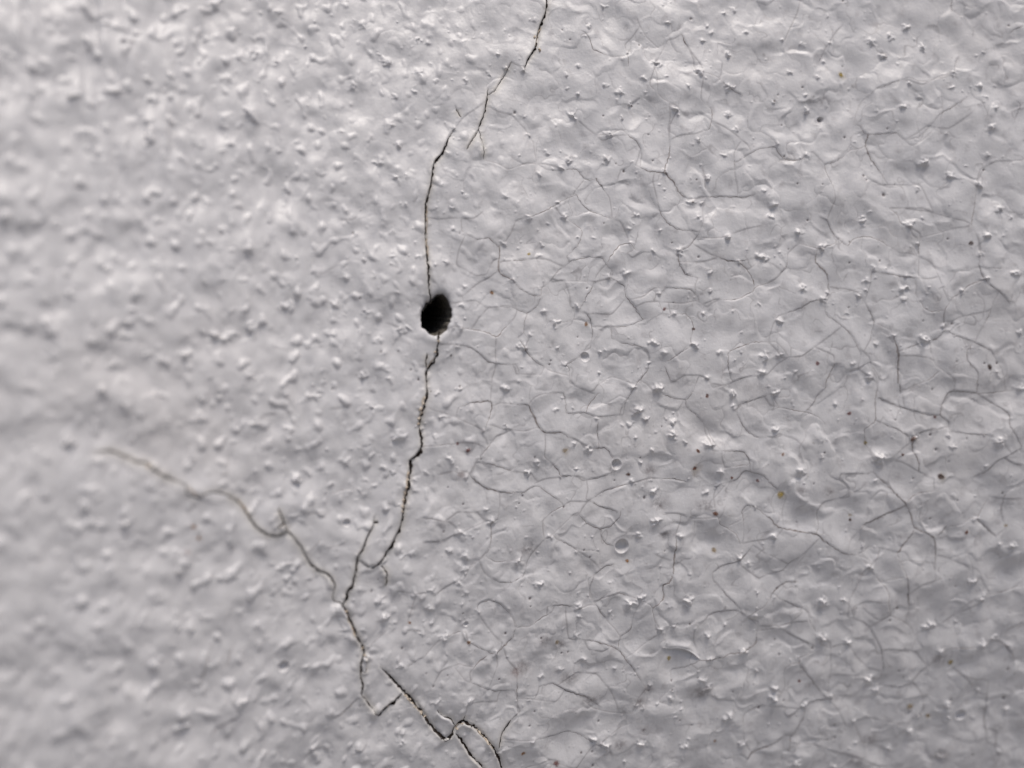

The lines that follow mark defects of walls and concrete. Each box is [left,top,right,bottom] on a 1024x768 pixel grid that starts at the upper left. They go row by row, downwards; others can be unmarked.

crack [425,0,548,304]
crack [629,136,684,197]
crack [734,147,840,190]
crack [856,125,903,172]
crack [535,169,699,418]
crack [94,238,681,768]
crack [708,195,1022,692]
crack [670,560,829,762]